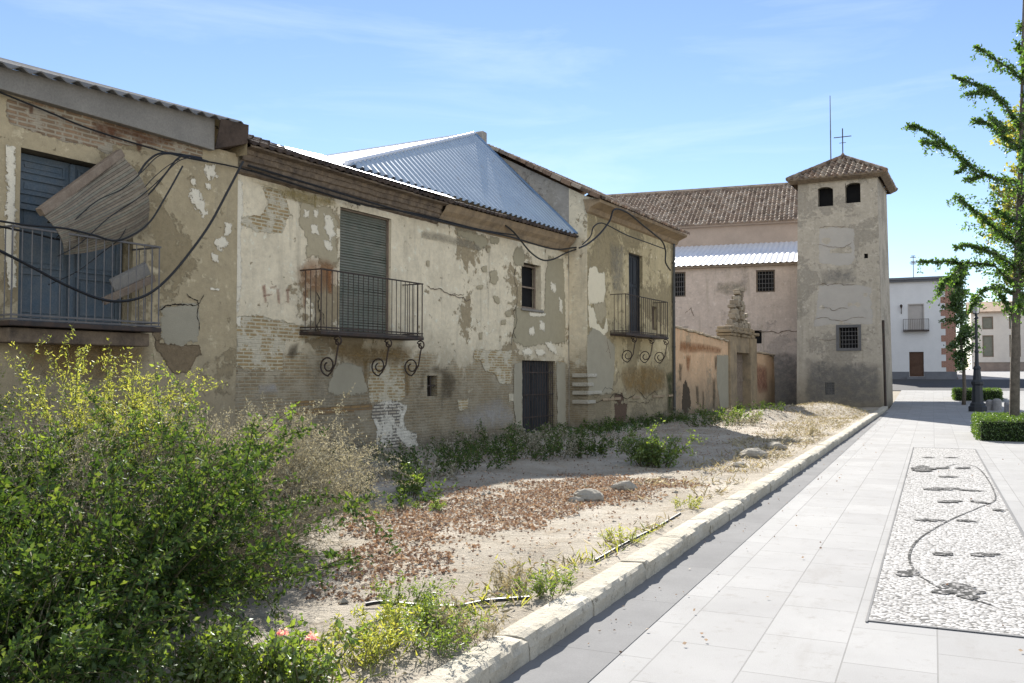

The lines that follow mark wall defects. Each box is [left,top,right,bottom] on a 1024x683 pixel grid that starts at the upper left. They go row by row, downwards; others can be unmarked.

flaking render [6,99,219,218]
peeling [211,222,232,262]
peeling [298,199,339,265]
crack [159,294,204,331]
peeling [588,305,608,335]
crack [758,283,864,341]
flaking render [152,332,202,375]
peeling [401,429,418,447]